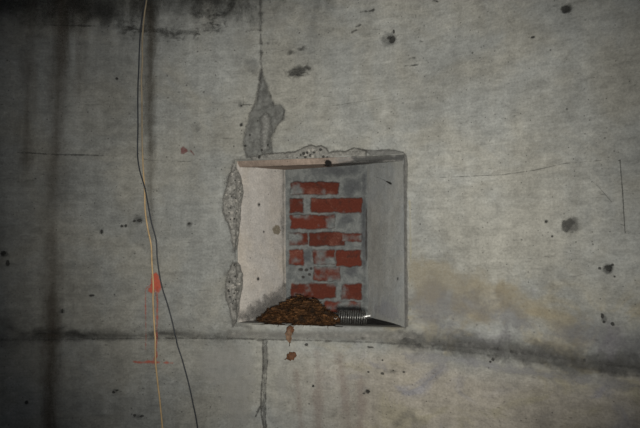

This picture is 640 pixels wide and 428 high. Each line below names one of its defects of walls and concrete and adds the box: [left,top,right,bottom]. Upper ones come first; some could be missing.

spalling [223,163,244,250]
peeling [240,72,408,327]
spalling [226,262,243,327]